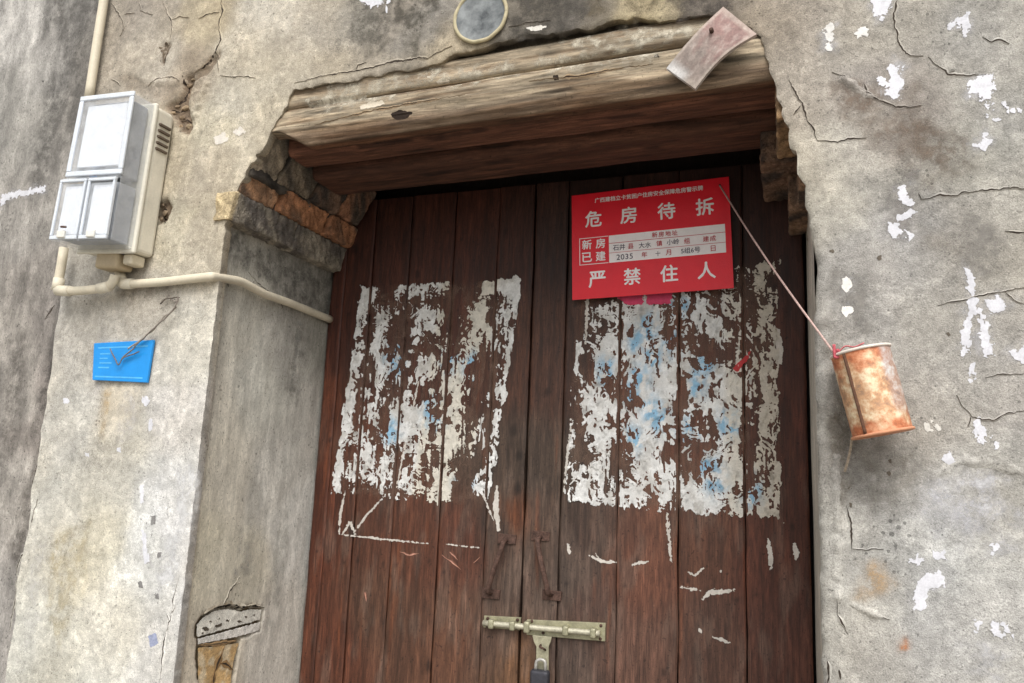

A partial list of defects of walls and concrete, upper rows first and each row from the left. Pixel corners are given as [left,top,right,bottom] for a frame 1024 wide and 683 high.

crack [111,0,254,86]
crack [789,81,867,144]
peeling [876,63,905,101]
peeling [966,74,1022,122]
peeling [0,185,46,206]
peeling [888,185,918,241]
crack [918,185,1024,200]
crack [938,287,1024,306]
peeling [946,267,1006,383]
crack [956,395,1024,427]
crack [846,506,882,551]
peeling [908,550,947,611]